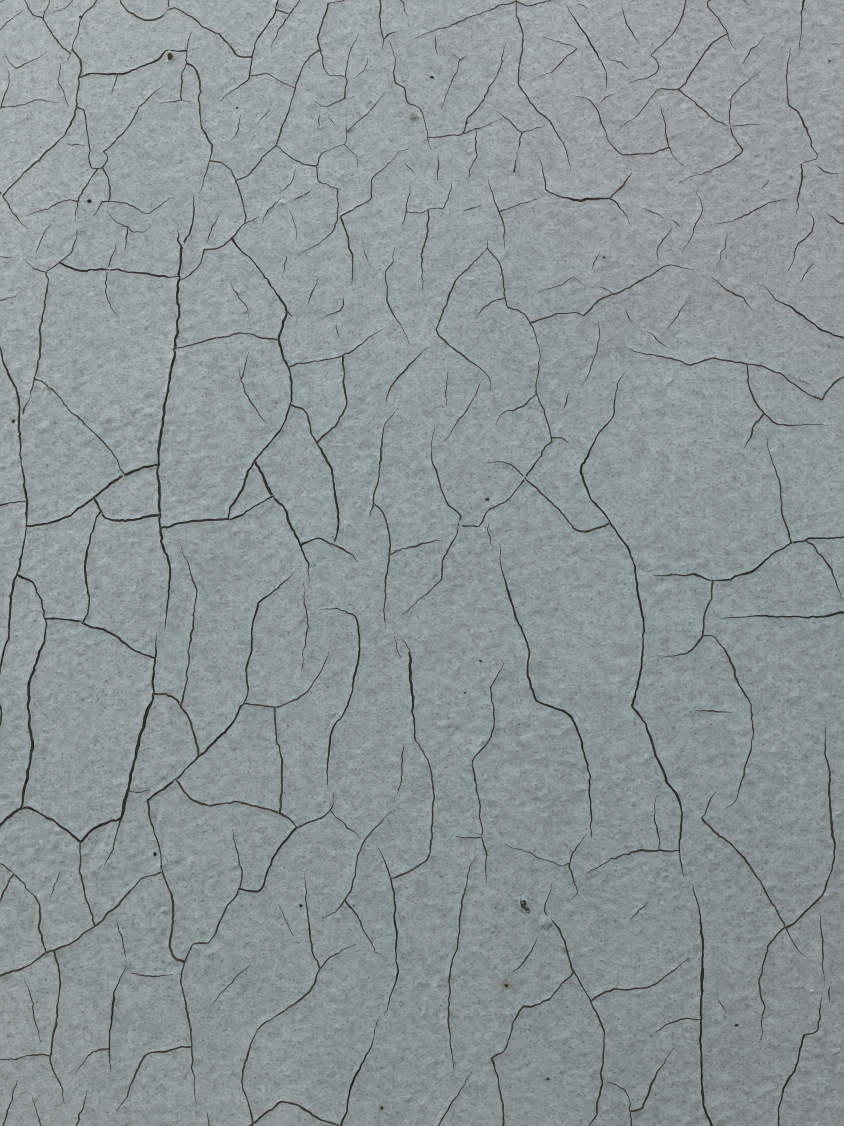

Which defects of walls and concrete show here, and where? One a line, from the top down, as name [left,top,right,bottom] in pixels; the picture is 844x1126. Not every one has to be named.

crack [0,0,574,1126]
crack [237,155,731,1126]
crack [538,0,767,185]
crack [626,300,844,1126]
crack [710,0,844,312]
crack [762,282,844,343]